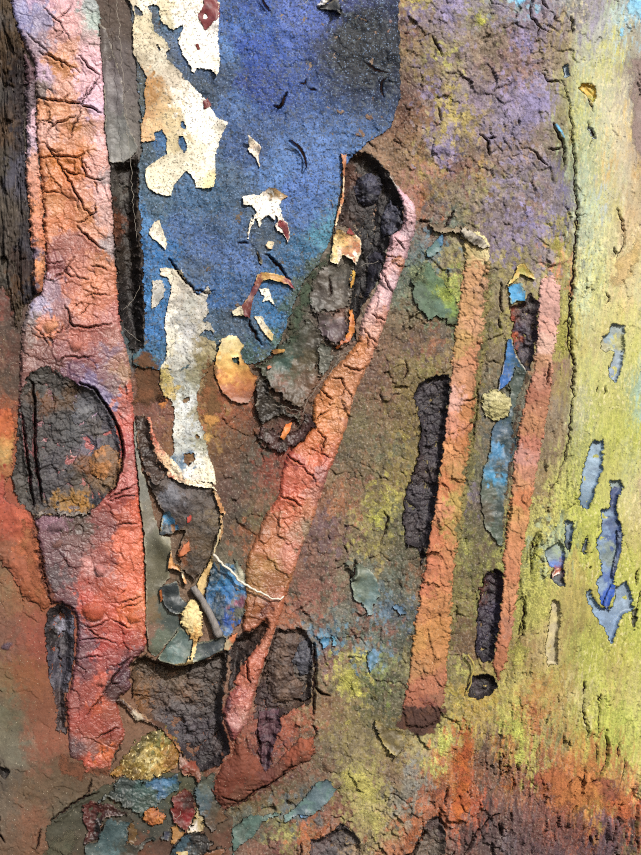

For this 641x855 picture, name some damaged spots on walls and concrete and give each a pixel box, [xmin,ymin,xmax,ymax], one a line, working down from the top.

crack [27,6,110,362]
spalling [109,154,144,353]
spalling [337,151,405,343]
crack [530,73,594,494]
crack [22,383,42,505]
spalling [11,365,123,516]
crack [79,383,138,501]
spalling [402,374,451,564]
crack [79,591,140,714]
spalling [85,559,314,855]
rust [453,732,473,823]
rust [534,755,633,819]